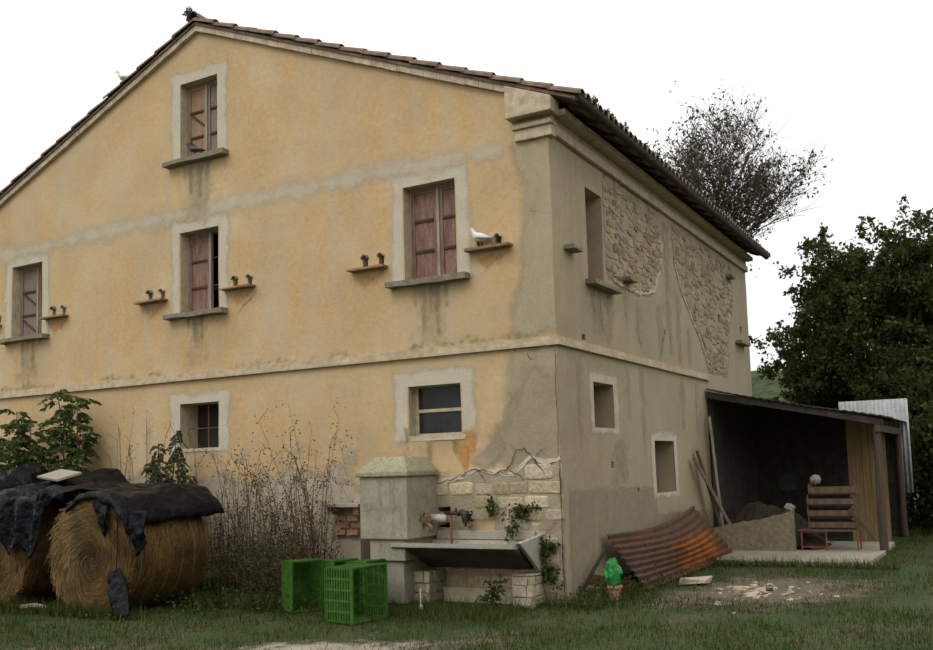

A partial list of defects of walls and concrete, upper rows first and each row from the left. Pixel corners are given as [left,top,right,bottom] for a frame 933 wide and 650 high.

flaking render [507,139,558,415]
flaking render [602,175,733,378]
crack [527,353,558,421]
peeling [198,466,361,578]
flaking render [431,449,567,604]
crack [436,446,565,593]